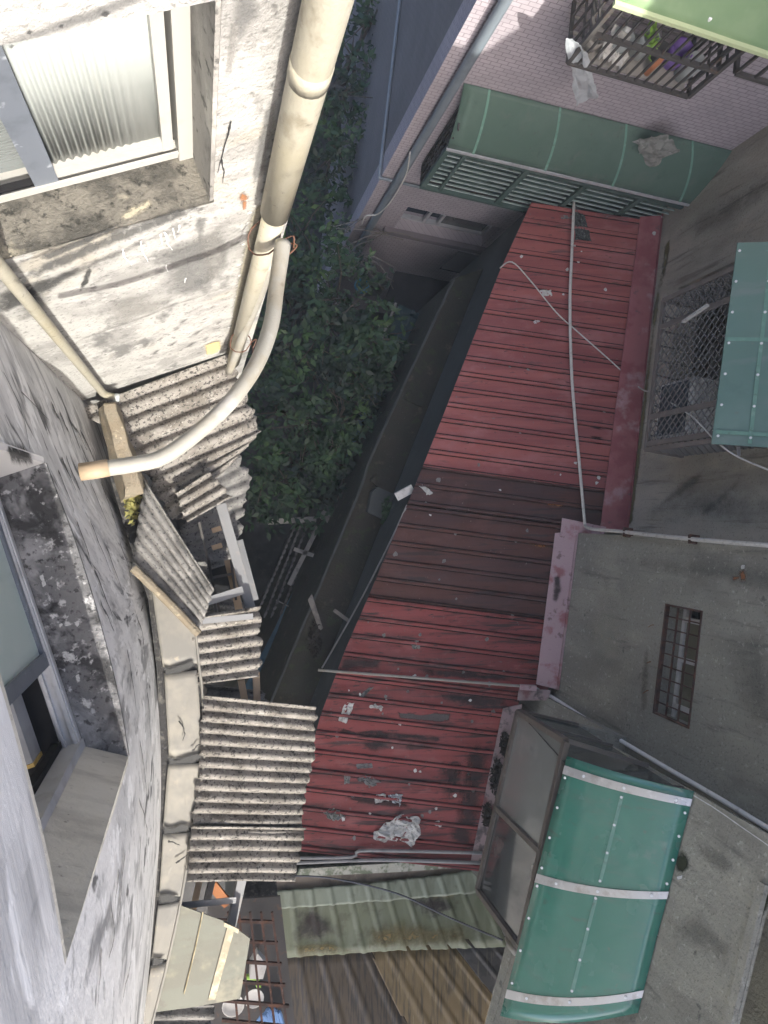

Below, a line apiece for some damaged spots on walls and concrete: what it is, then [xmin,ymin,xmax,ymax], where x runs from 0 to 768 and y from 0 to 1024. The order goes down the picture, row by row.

crack [218,121,232,179]
water stain [58,456,132,630]